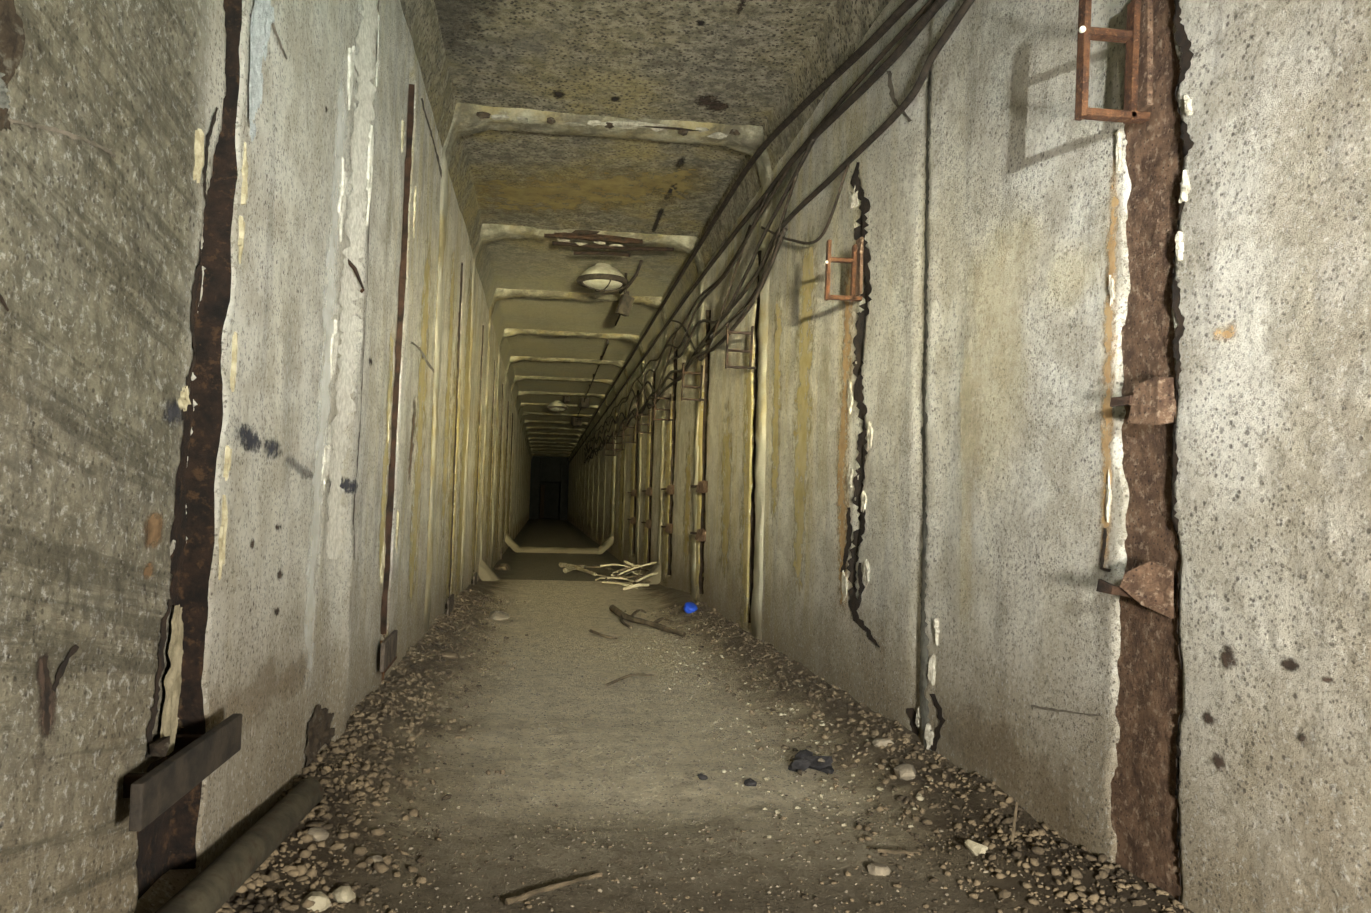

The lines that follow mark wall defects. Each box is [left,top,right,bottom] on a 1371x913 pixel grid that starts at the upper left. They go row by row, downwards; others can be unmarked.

spalling [0,0,25,131]
spalling [146,0,275,773]
crack [837,162,880,647]
rust [1101,180,1119,558]
spalling [136,782,202,901]